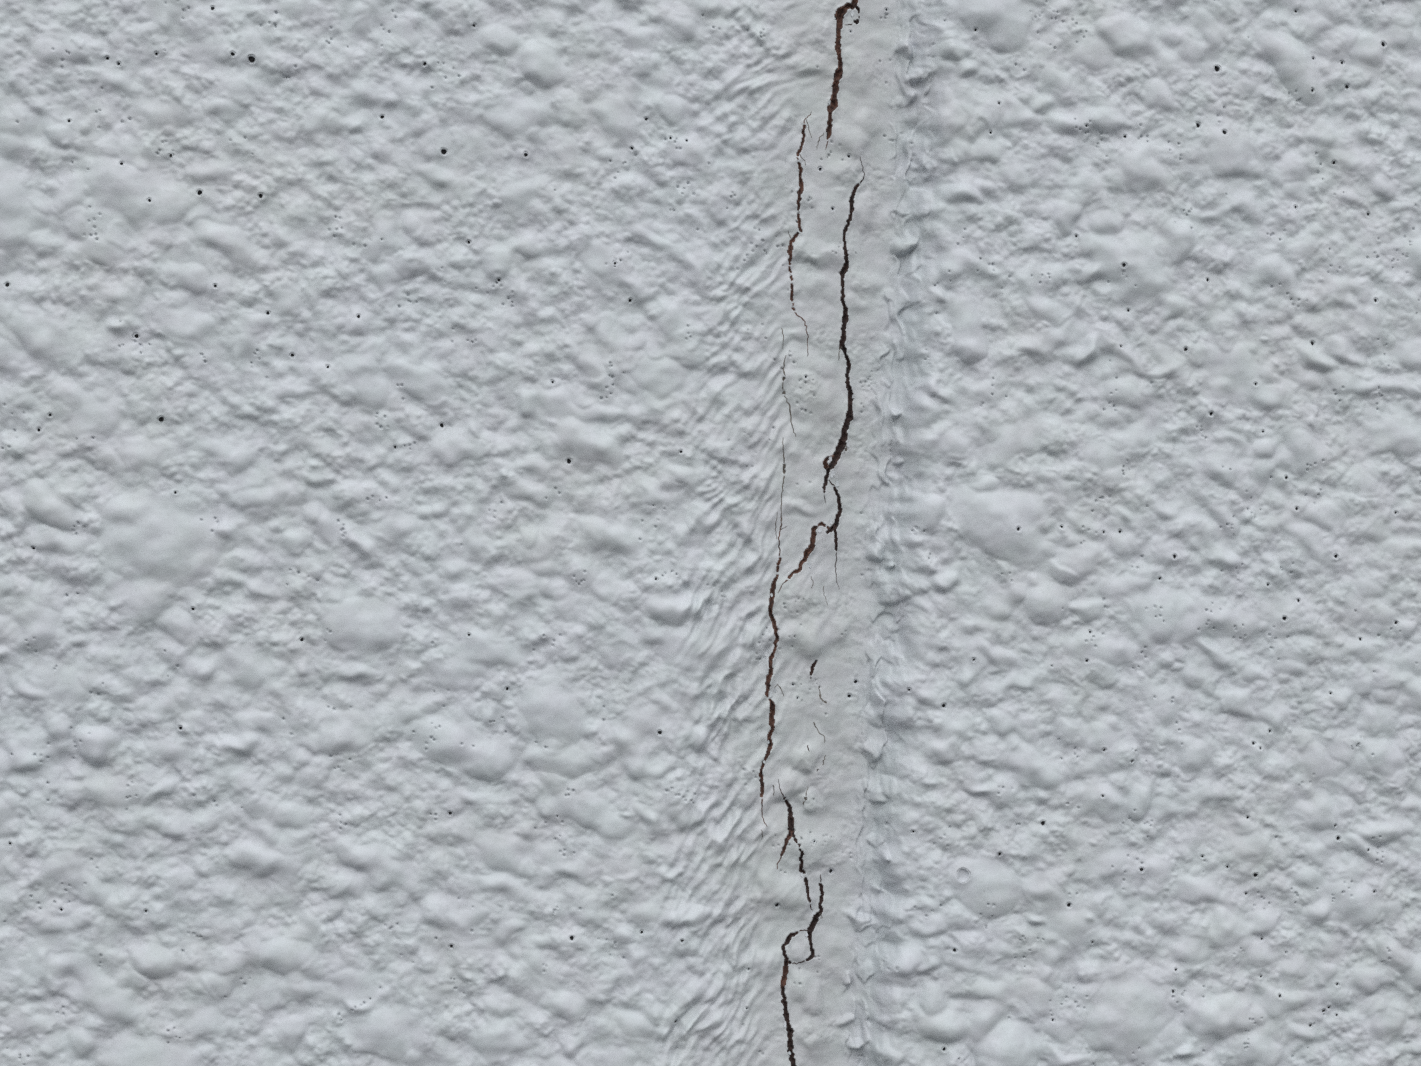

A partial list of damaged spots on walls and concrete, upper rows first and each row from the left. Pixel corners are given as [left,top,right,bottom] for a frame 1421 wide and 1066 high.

crack [759,0,865,1066]